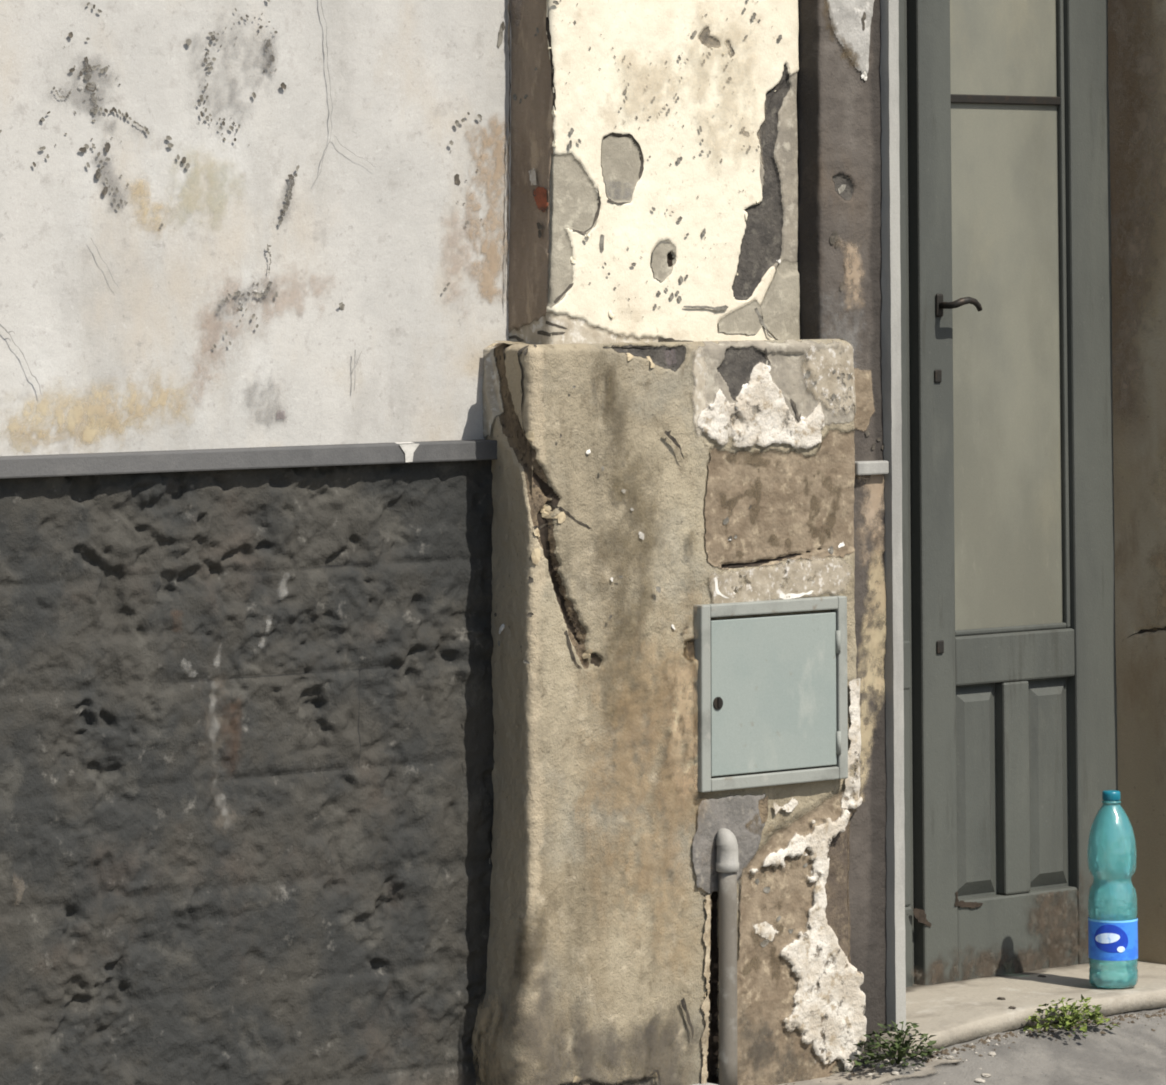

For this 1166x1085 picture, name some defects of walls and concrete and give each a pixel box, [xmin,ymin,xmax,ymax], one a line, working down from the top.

peeling [824,0,874,80]
flaking render [482,0,856,570]
crack [493,343,602,669]
crack [1129,626,1166,637]
flaking render [737,678,867,1085]
flaking render [566,1070,661,1085]
flaking render [681,891,719,1084]